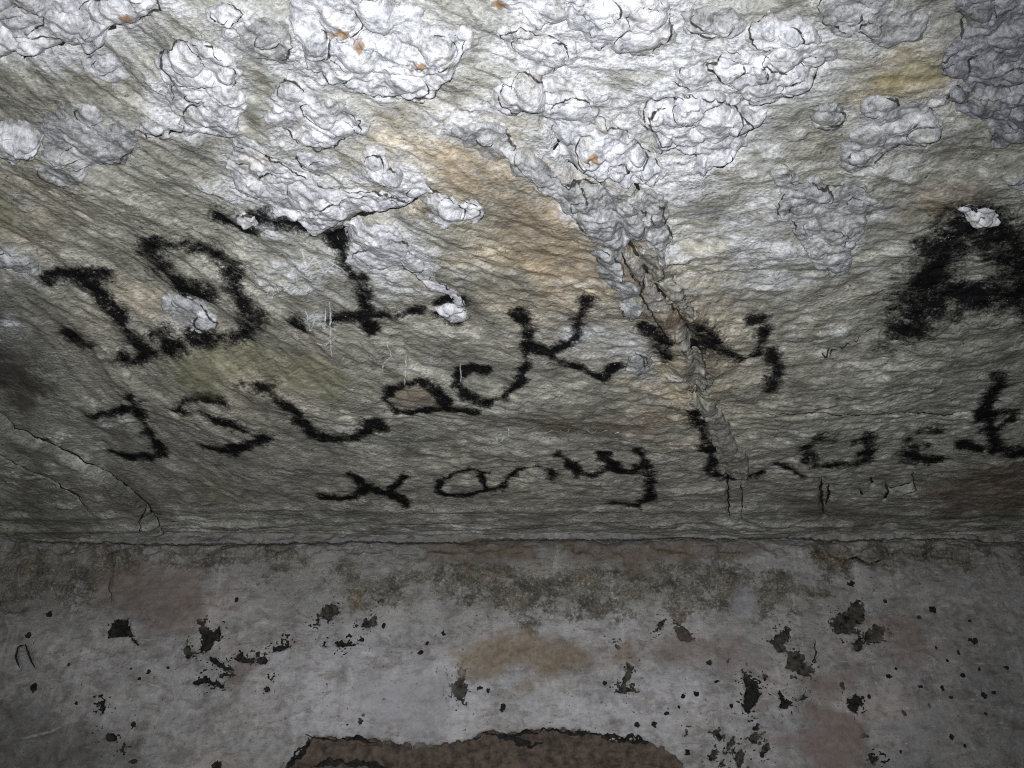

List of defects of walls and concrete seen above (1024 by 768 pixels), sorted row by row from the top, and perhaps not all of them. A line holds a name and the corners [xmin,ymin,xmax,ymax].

damp [937,0,1024,149]
damp [0,0,486,323]
damp [451,0,944,397]
damp [954,203,1001,229]
damp [161,293,219,333]
crack [0,411,1024,602]
peeling [107,618,139,651]
peeling [175,615,295,695]
spalling [285,621,821,768]
peeling [824,581,892,651]